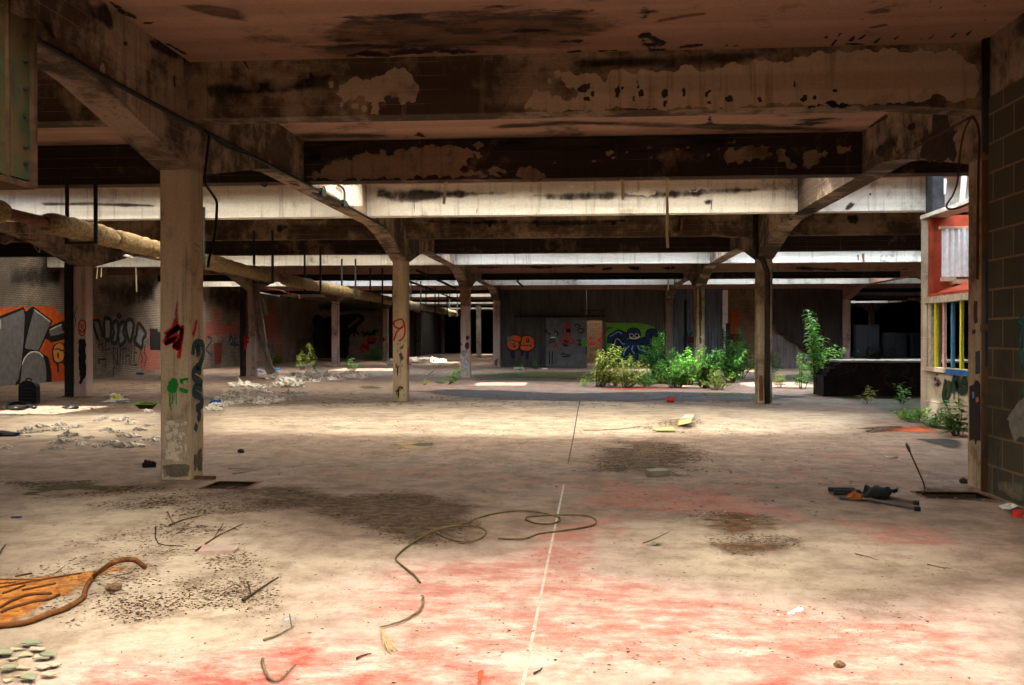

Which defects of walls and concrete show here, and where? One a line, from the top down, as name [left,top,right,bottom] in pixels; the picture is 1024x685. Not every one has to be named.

damp [321,5,758,68]
peeling [328,67,419,115]
peeling [524,48,979,113]
peeling [289,141,556,208]
peeling [707,140,852,169]